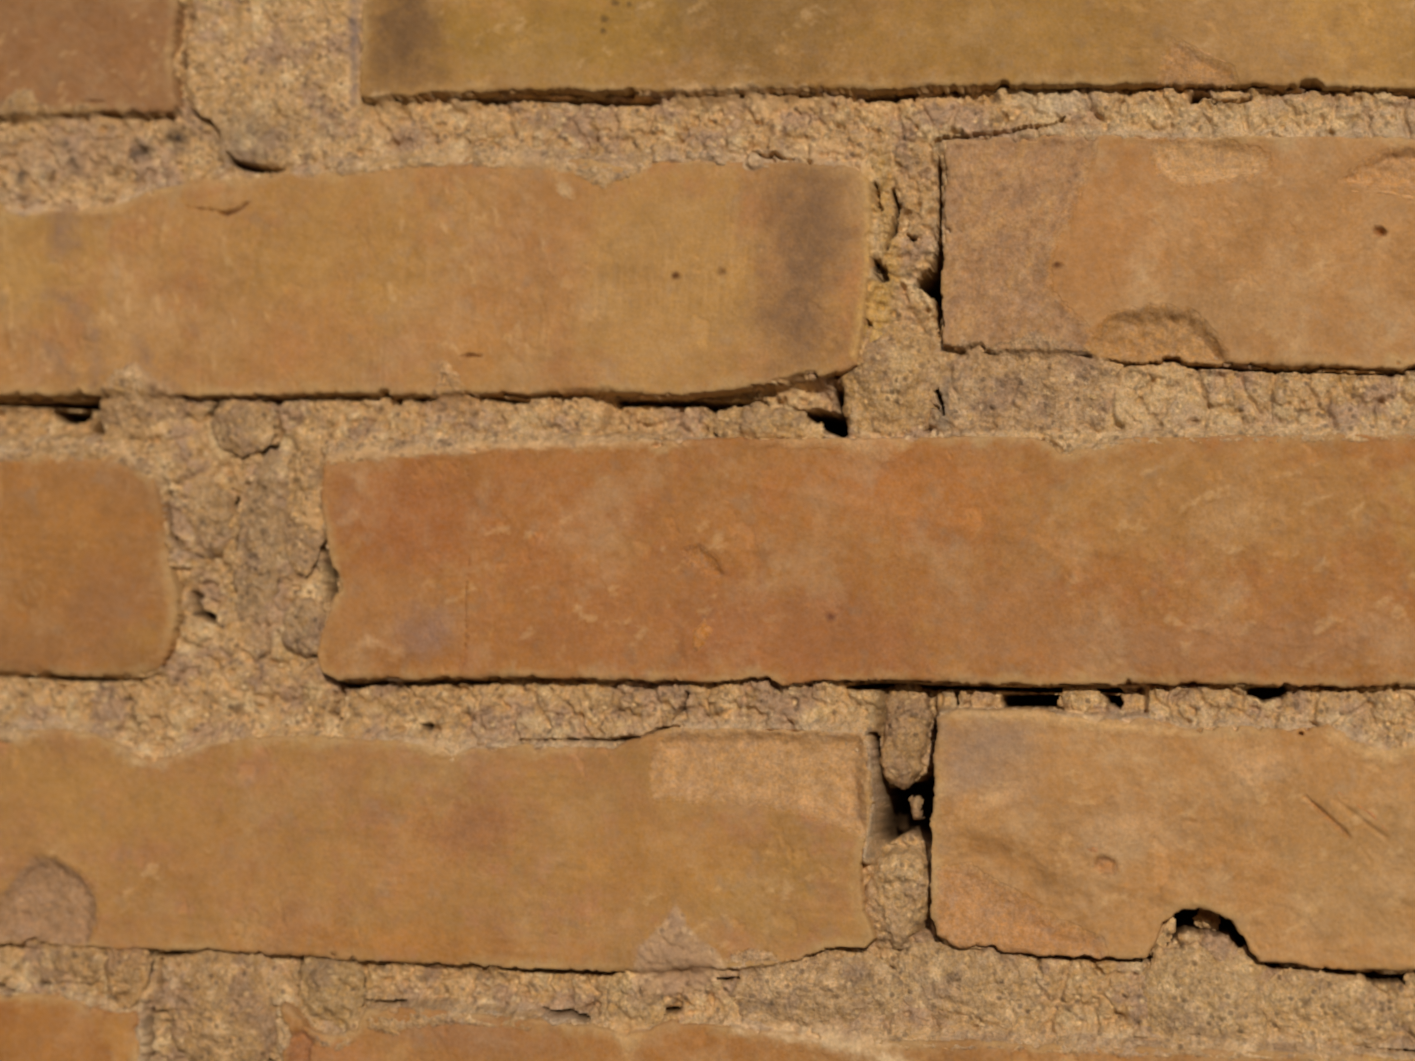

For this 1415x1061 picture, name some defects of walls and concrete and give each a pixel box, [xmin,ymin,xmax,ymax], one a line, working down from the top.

crack [182,10,286,218]
crack [163,487,223,559]
crack [259,619,318,659]
crack [517,690,690,743]
spalling [0,855,100,947]
spalling [1143,908,1252,962]
peeling [729,947,782,978]
spalling [1321,968,1359,976]